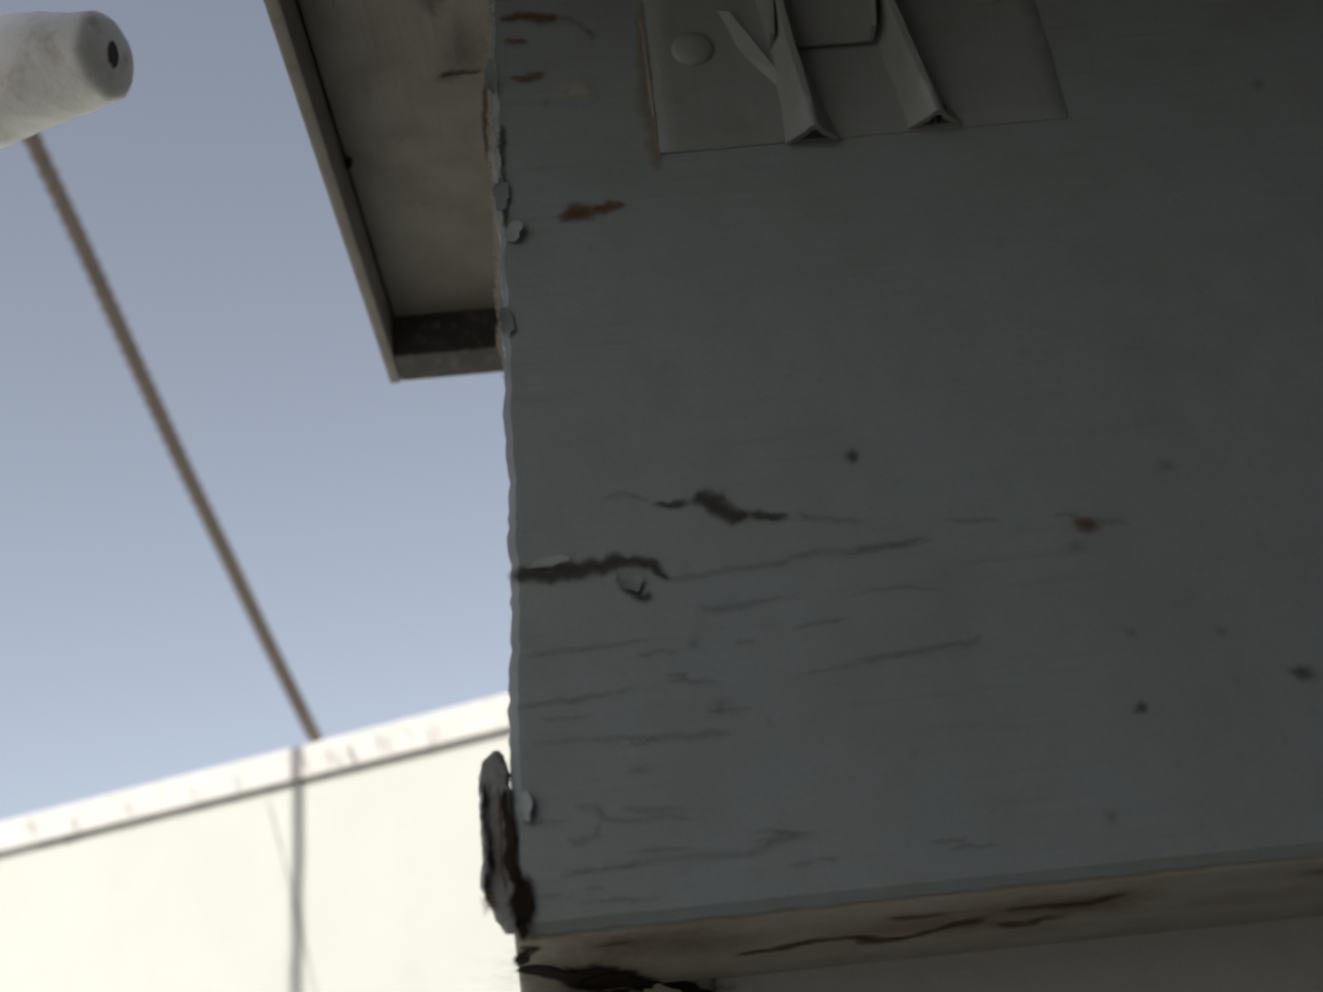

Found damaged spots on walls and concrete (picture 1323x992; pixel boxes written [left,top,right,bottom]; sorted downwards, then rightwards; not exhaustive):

rust [562,202,623,219]
crack [656,491,787,523]
crack [512,554,668,600]
peeling [516,790,532,822]
crack [738,895,1124,956]
spalling [516,965,712,992]